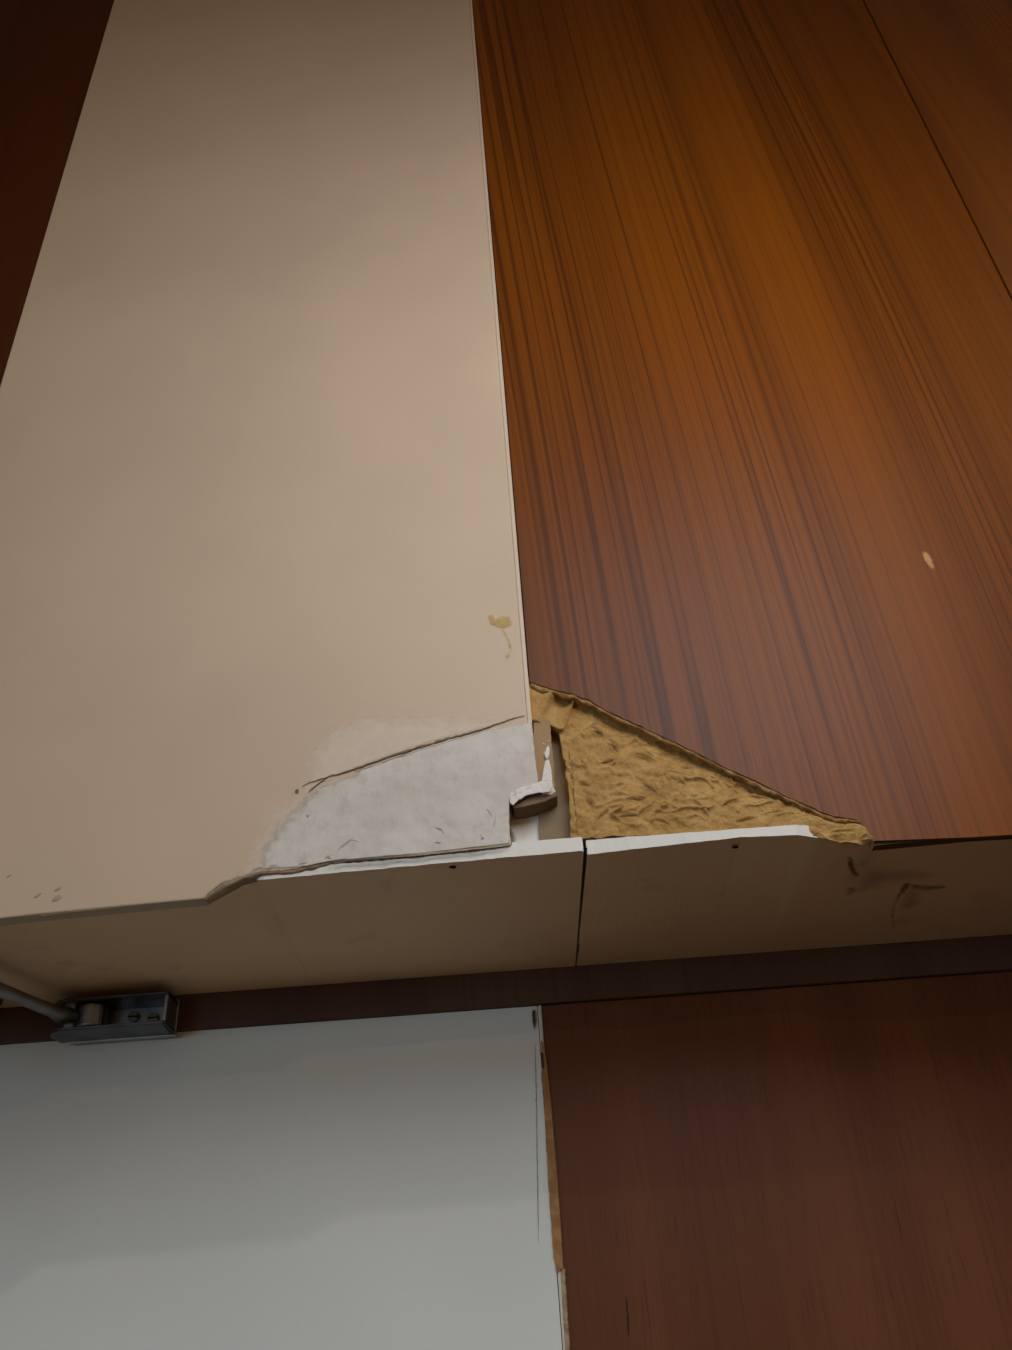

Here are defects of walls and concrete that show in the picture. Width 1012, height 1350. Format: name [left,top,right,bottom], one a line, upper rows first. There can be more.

flaking render [204,717,617,904]